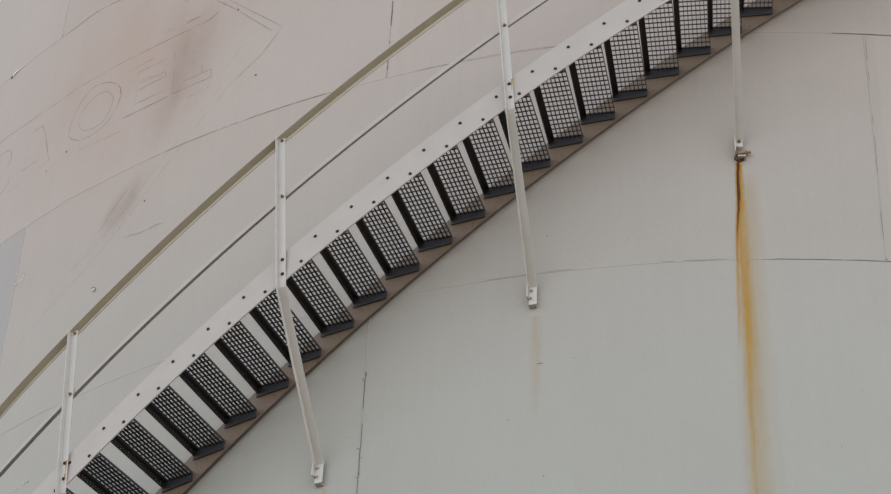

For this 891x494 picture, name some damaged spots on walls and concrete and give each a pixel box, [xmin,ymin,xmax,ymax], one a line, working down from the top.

rust [735,162,746,303]